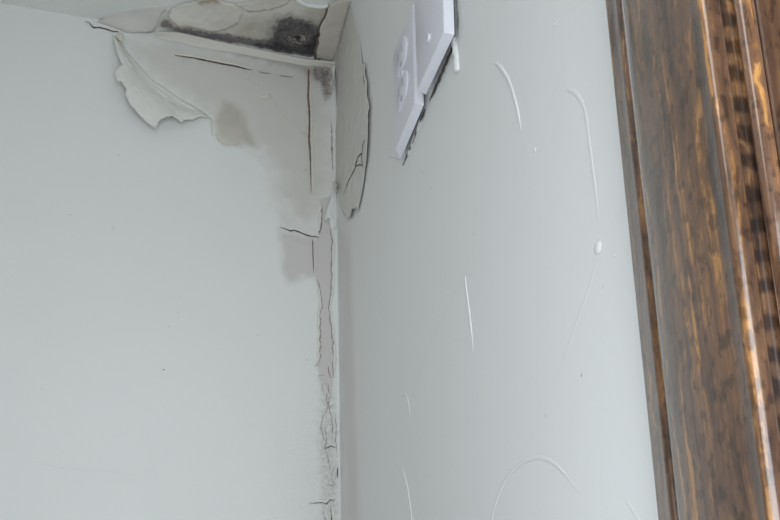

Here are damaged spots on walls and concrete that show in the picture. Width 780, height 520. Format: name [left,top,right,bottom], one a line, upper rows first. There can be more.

peeling [112,33,211,129]
leakage [161,17,319,56]
peeling [169,0,351,61]
peeling [314,189,337,396]
crack [309,367,338,520]